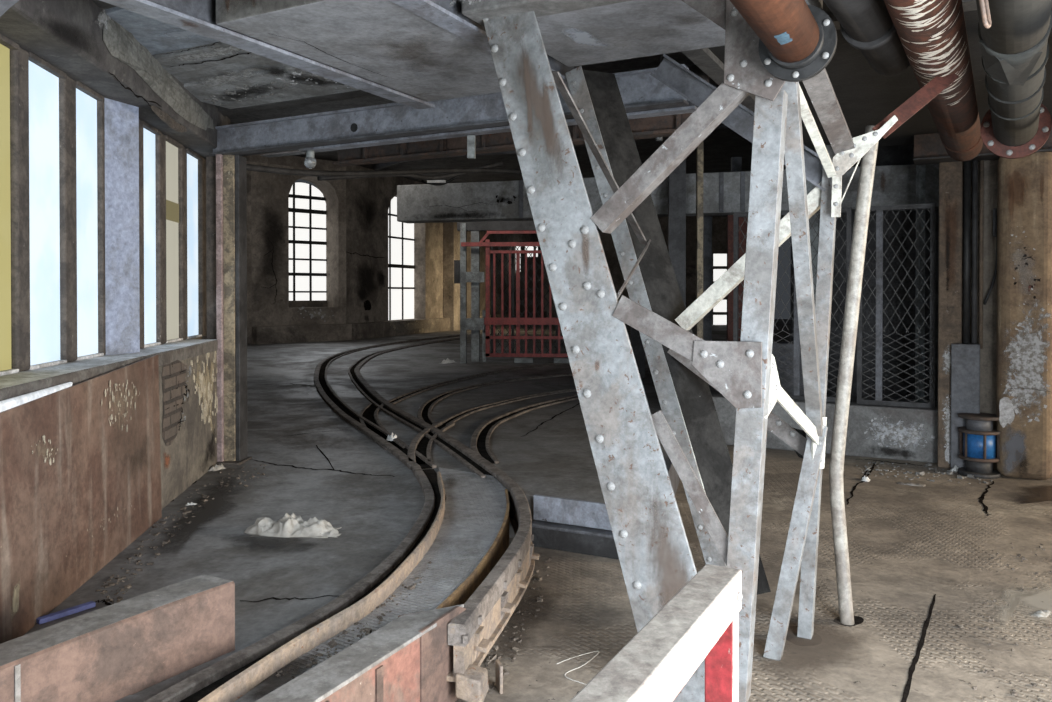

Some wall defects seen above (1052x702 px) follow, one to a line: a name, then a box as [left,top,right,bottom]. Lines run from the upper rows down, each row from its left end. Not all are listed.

crack [166,42,252,67]
peeling [999,226,1050,428]
spalling [162,351,218,446]
crack [255,430,394,477]
crack [978,481,994,516]
water stain [1017,486,1052,510]
crack [240,594,334,602]